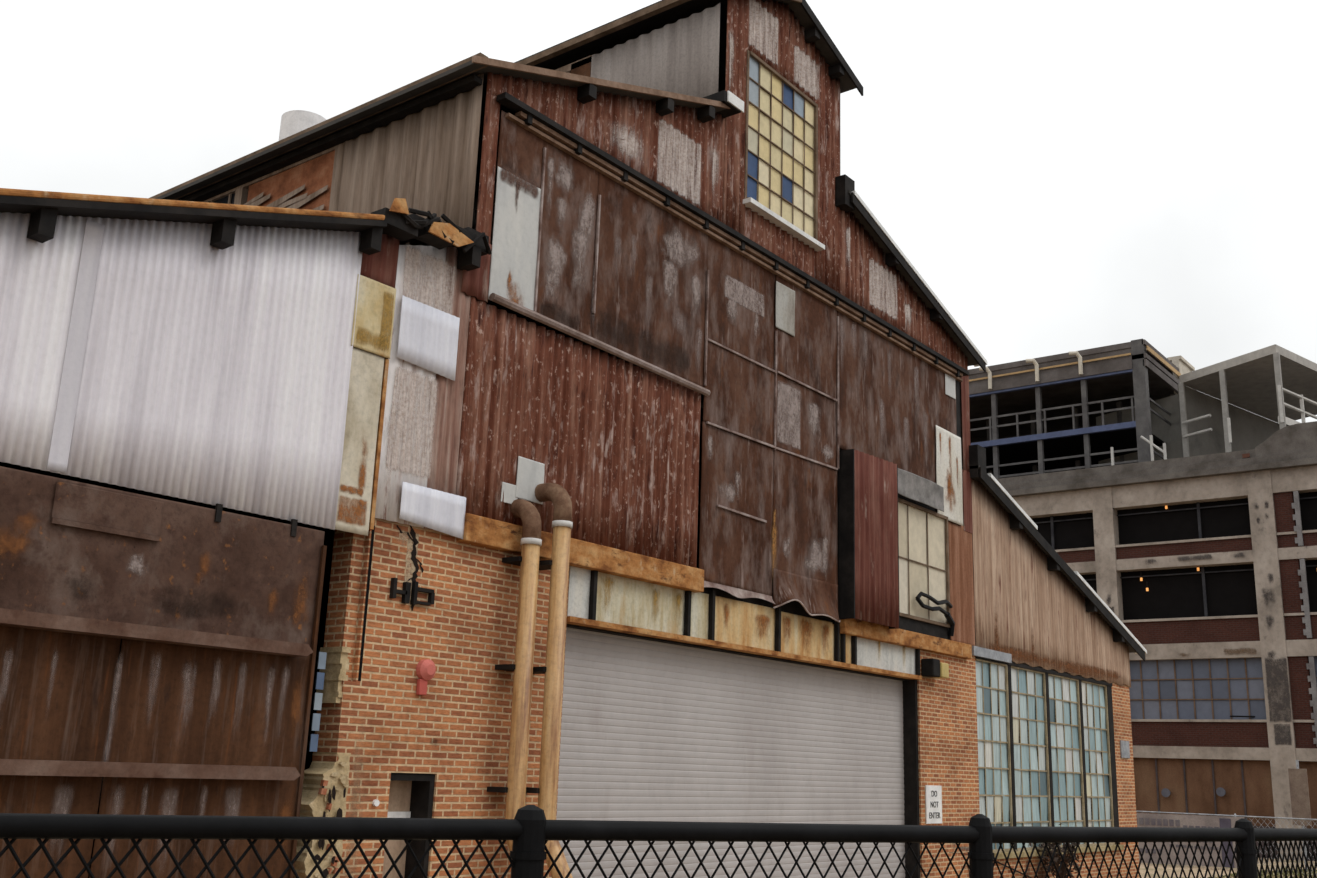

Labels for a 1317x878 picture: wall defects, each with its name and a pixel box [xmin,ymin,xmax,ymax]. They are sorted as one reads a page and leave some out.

crack [397,525,424,611]
spalling [300,752,351,817]
spalling [294,840,343,878]